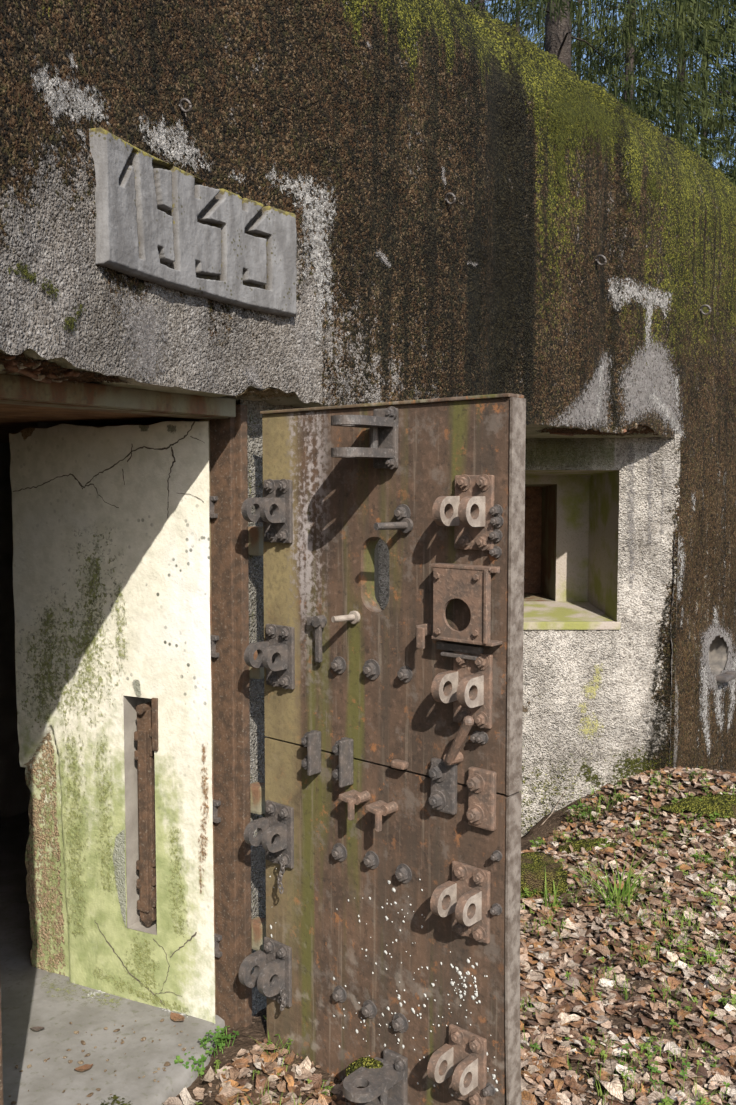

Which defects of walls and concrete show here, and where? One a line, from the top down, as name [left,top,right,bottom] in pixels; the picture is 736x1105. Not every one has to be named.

water stain [31,54,109,148]
water stain [139,116,210,171]
water stain [542,111,684,440]
spalling [0,352,128,384]
crack [13,421,203,517]
spalling [536,423,659,437]
water stain [83,558,101,684]
water stain [115,587,128,659]
water stain [699,607,736,755]
spalling [24,733,65,976]